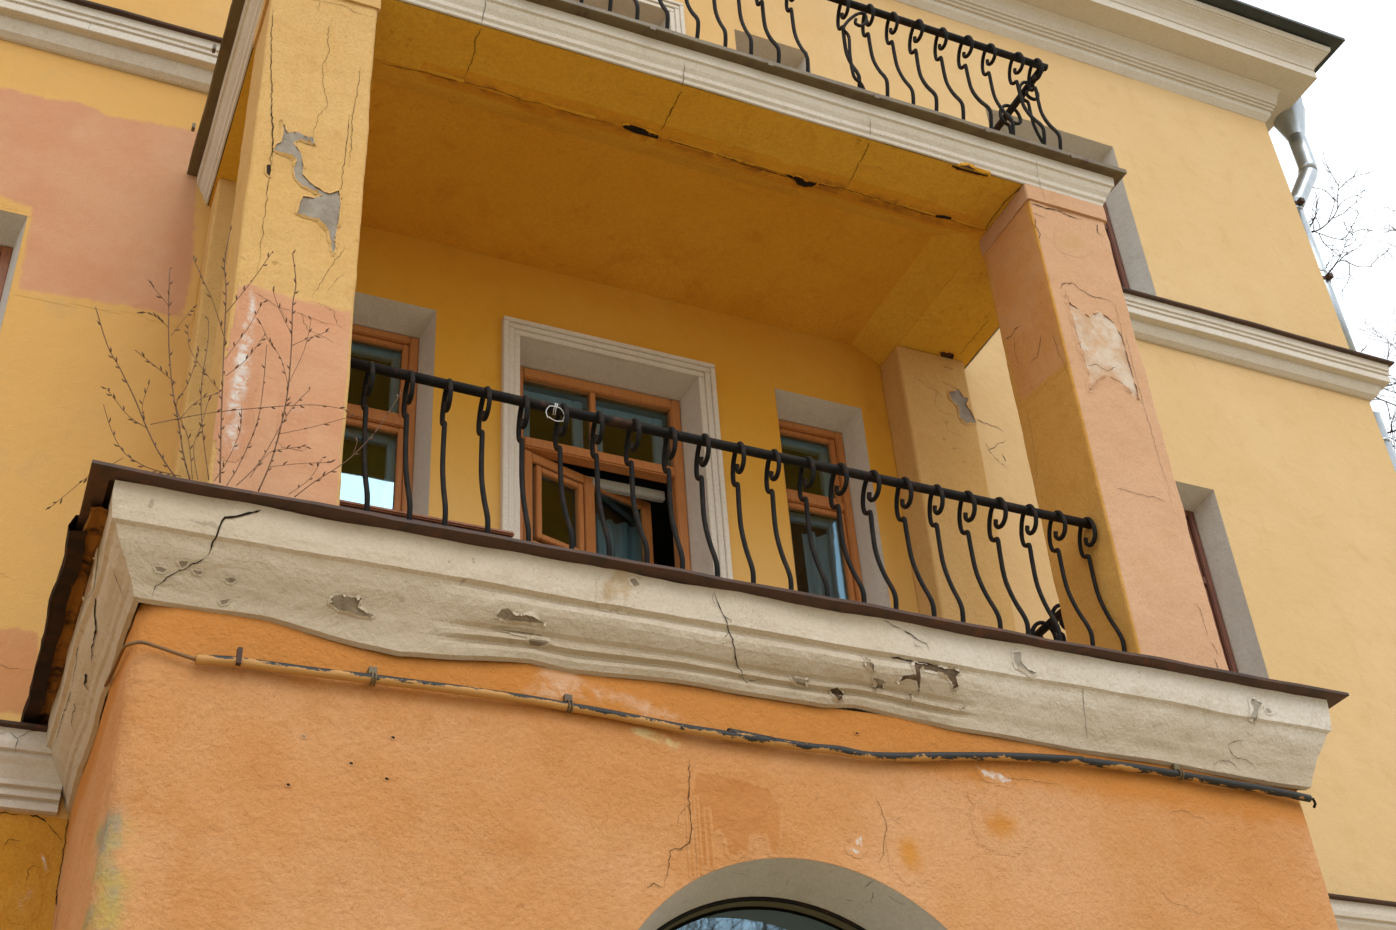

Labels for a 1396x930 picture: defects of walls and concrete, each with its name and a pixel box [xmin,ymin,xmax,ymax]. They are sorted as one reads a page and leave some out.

crack [260,13,274,257]
peeling [273,119,343,256]
crack [313,0,1101,237]
crack [257,248,347,342]
peeling [1062,292,1143,404]
peeling [947,388,977,425]
crack [0,510,260,750]
peeling [327,592,377,619]
peeling [493,606,553,648]
crack [712,595,764,682]
spalling [861,655,961,705]
crack [647,764,692,888]